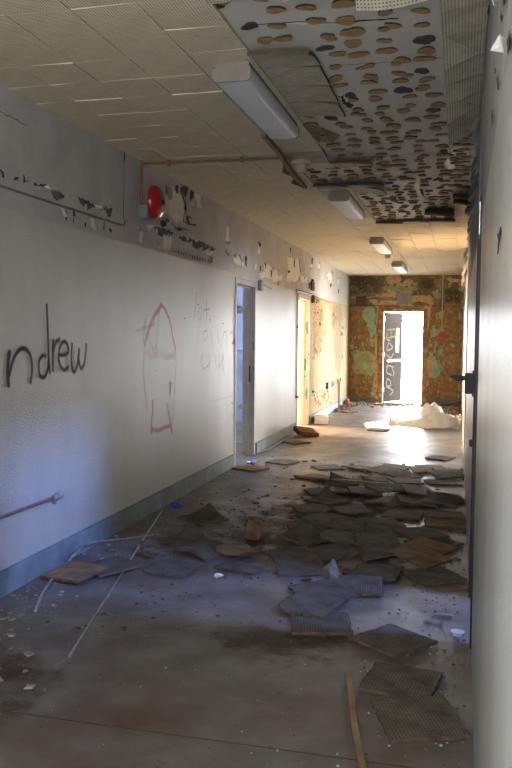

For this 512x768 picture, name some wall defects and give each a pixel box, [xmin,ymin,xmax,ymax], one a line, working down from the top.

peeling [490,33,510,55]
flaking render [14,175,116,233]
peeling [137,185,339,294]
peeling [306,116,481,399]